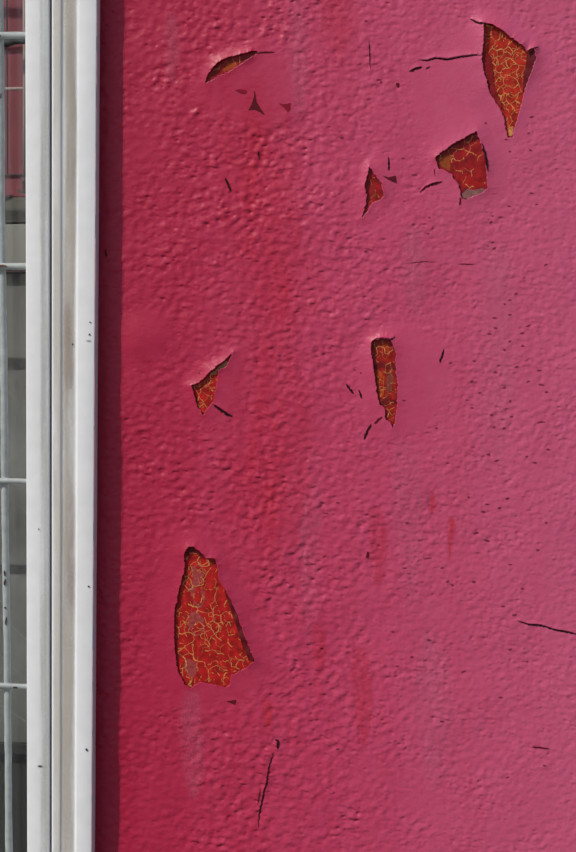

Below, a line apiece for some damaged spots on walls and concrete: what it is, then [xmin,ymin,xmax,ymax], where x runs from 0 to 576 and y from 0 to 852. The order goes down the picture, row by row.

peeling [205,51,258,83]
crack [409,54,478,72]
peeling [482,23,536,140]
peeling [362,167,396,217]
peeling [435,131,488,200]
peeling [191,355,232,415]
peeling [371,339,406,428]
peeling [174,547,254,688]
crack [517,620,576,635]
crack [257,739,279,827]